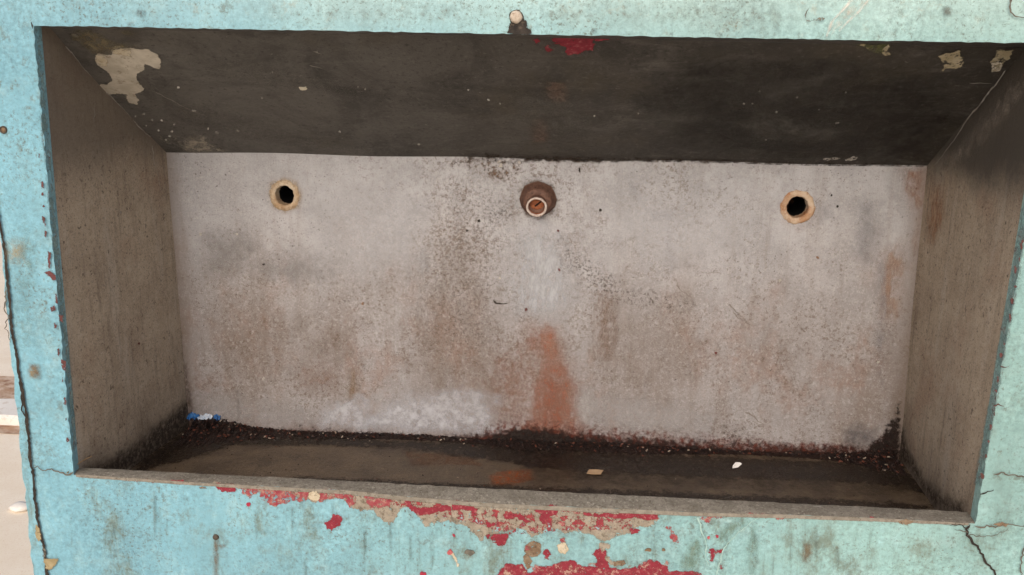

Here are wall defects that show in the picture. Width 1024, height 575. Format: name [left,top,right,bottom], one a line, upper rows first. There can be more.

flaking render [71,31,161,105]
peeling [507,10,618,55]
flaking render [938,50,964,71]
flaking render [990,49,1013,72]
crack [0,221,73,575]
leakage [308,390,962,512]
peeling [199,481,763,575]
crack [950,523,1024,575]